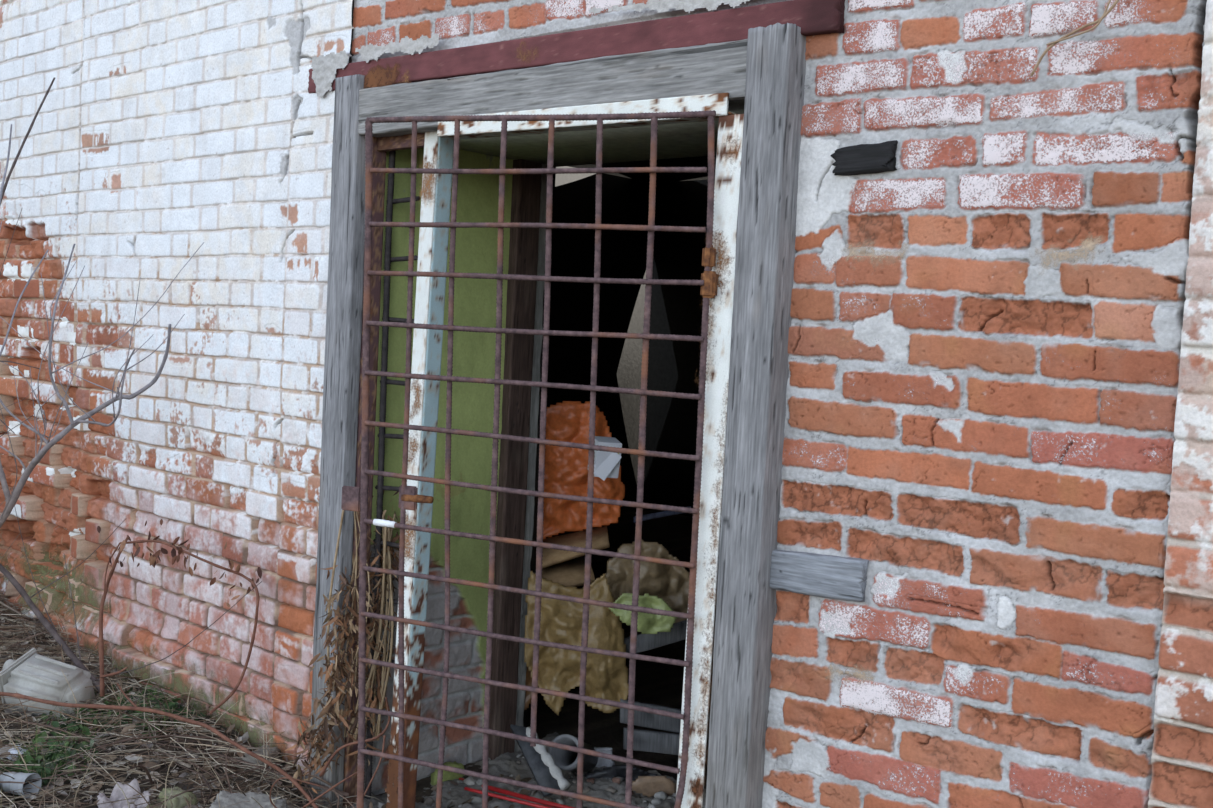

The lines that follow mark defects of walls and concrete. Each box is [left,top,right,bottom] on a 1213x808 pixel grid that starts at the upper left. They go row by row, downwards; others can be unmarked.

crack [278,0,315,186]
rust [420,160,436,201]
crack [278,225,299,265]
spalling [845,212,906,251]
spalling [970,210,1114,252]
spalling [957,293,1095,340]
rust [410,381,421,419]
peeling [0,181,323,747]
crack [270,415,285,480]
crack [1056,437,1077,469]
rust [707,436,724,629]
rust [692,709,709,808]